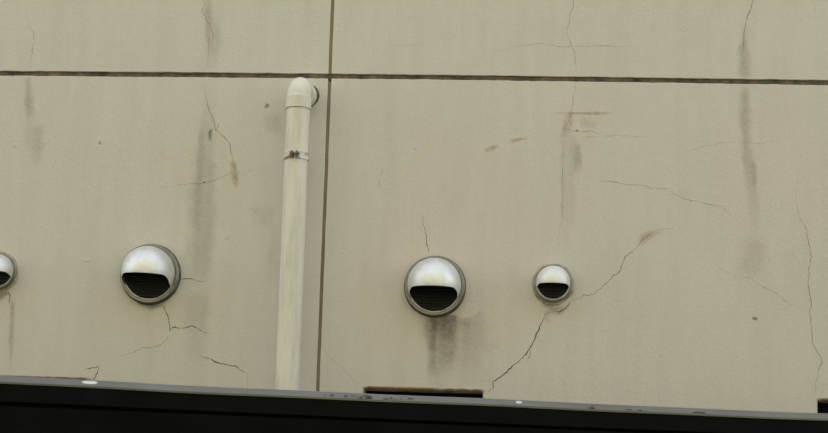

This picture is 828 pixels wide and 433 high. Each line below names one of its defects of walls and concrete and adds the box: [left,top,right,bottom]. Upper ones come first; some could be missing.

crack [178,84,255,185]
crack [87,307,209,380]
crack [488,228,678,392]
crack [725,182,822,391]